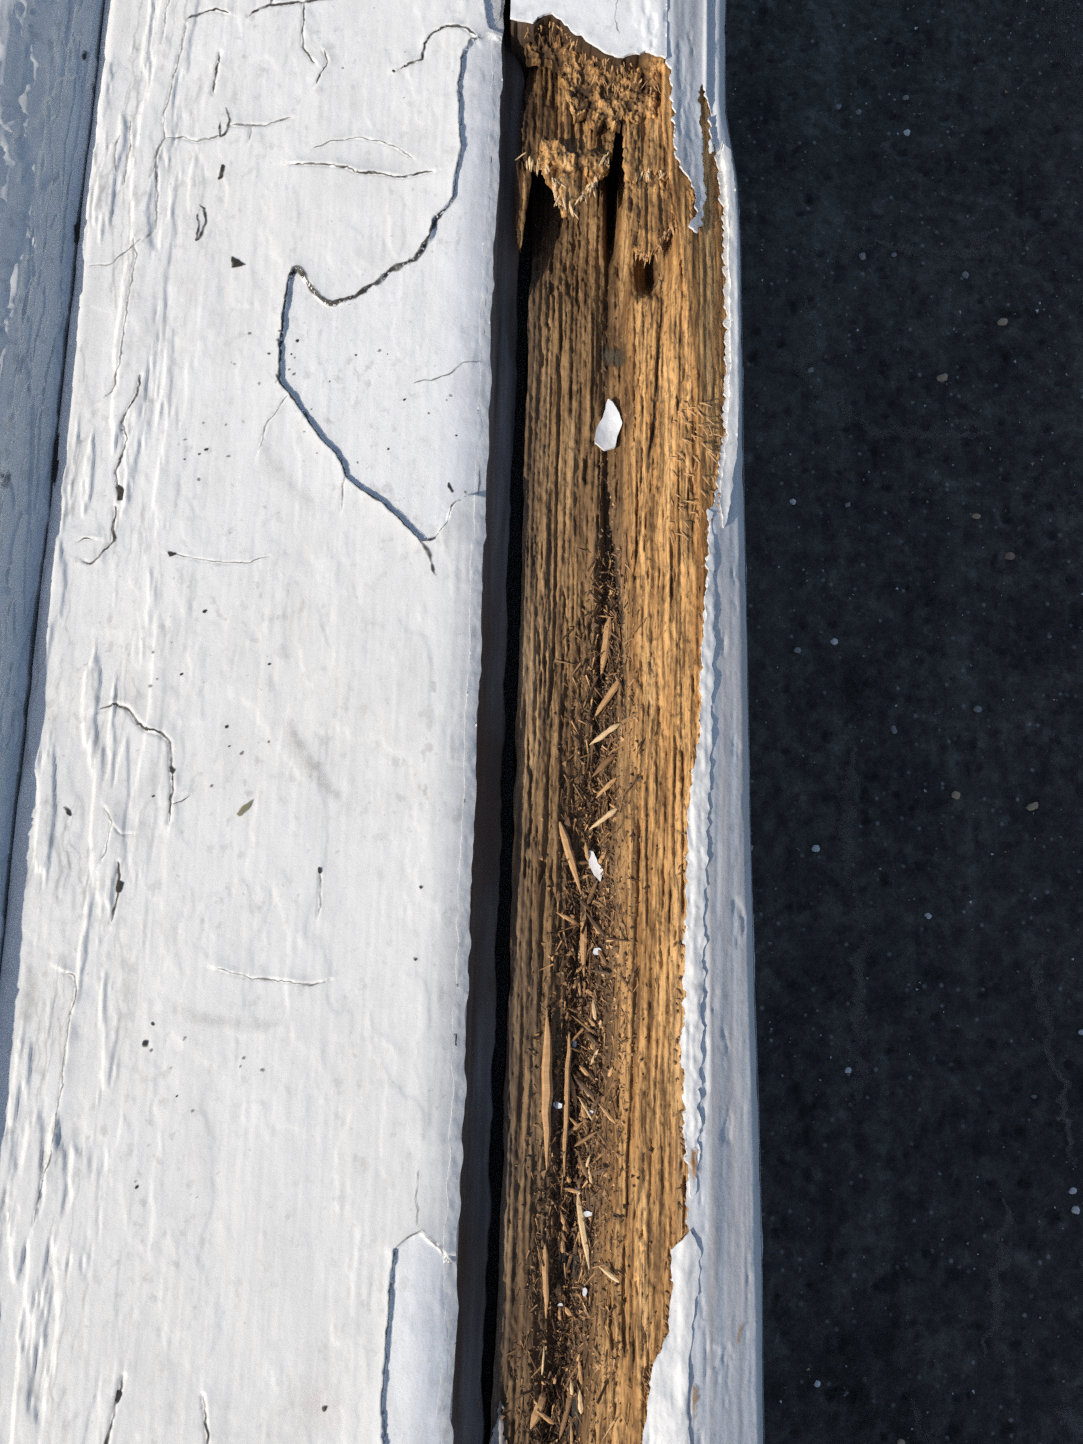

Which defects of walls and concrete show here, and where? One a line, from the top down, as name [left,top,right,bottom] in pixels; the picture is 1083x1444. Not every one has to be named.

crack [400,24,476,69]
crack [291,137,433,178]
crack [78,0,328,565]
crack [101,703,186,822]
peeling [381,1171,461,1444]
peeling [642,1230,701,1444]